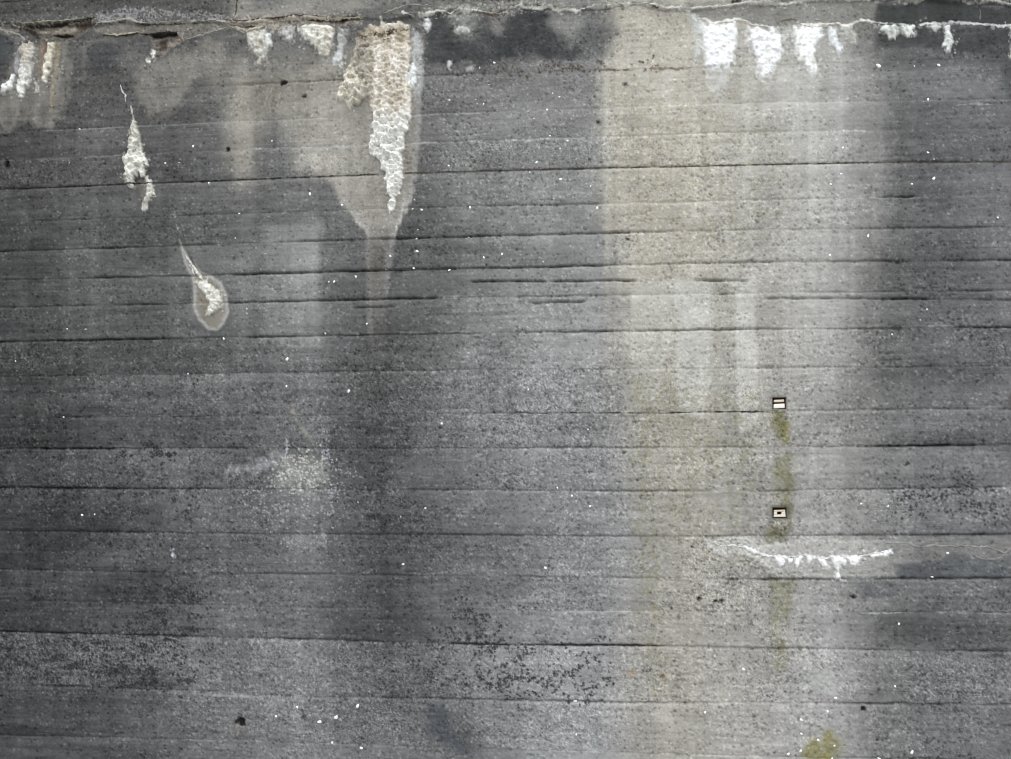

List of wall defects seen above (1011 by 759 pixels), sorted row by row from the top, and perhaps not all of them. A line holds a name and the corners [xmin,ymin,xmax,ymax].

damp [0,35,77,136]
damp [79,35,120,82]
crack [0,0,1011,44]
damp [118,8,624,372]
damp [583,0,1011,759]
damp [214,402,367,553]
damp [424,700,476,759]